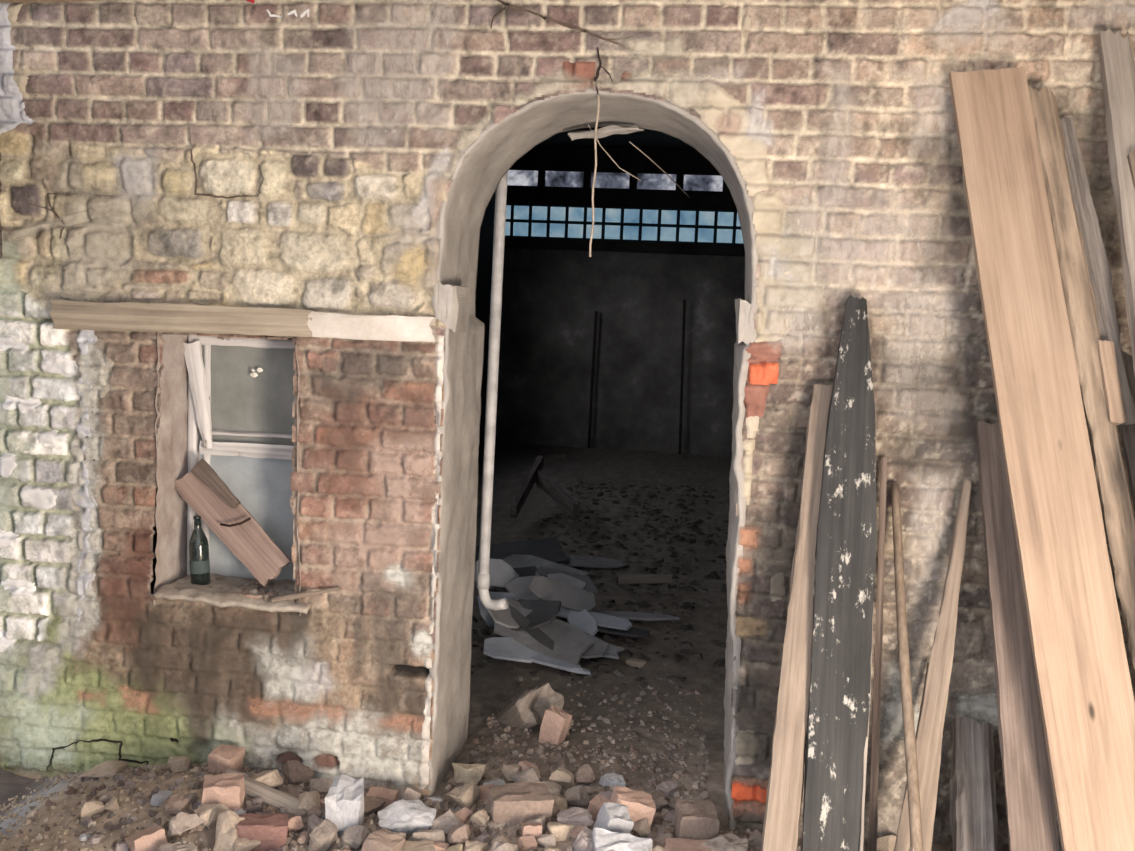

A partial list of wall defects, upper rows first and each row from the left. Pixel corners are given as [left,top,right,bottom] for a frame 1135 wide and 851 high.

crack [491,0,639,95]
crack [190,149,264,198]
spalling [743,342,782,505]
damp [386,565,410,586]
spalling [738,528,759,603]
peeling [770,572,785,602]
damp [412,631,433,656]
spalling [735,616,767,637]
damp [119,611,425,788]
crack [46,739,148,771]
peeling [735,729,760,766]